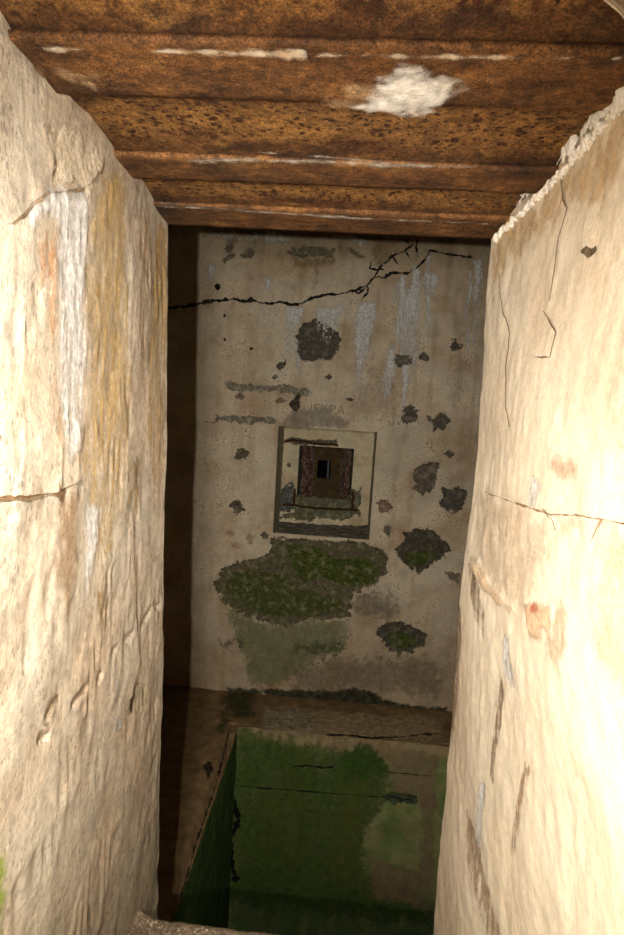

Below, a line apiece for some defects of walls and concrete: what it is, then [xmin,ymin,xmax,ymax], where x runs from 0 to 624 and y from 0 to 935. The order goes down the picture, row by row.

crack [140,216,473,379]
spalling [295,318,342,362]
water stain [354,301,376,386]
water stain [382,255,439,406]
crack [499,277,510,427]
crack [537,178,567,358]
crack [0,480,82,501]
spalling [280,481,368,528]
spalling [412,450,468,514]
crack [484,491,624,540]
spalling [213,527,452,628]
spalling [375,621,427,657]